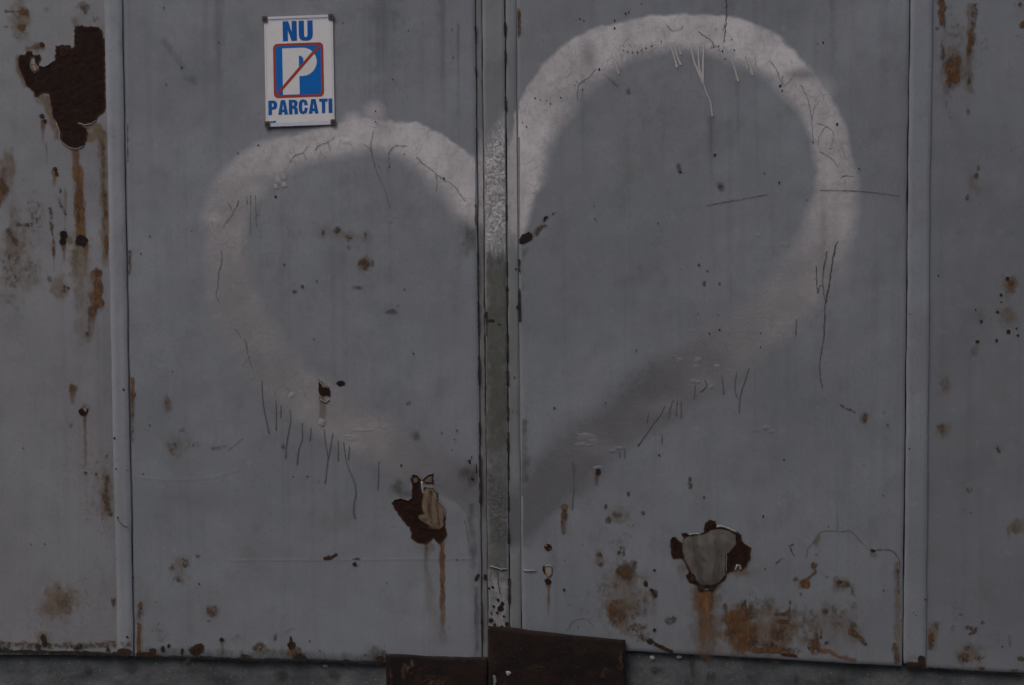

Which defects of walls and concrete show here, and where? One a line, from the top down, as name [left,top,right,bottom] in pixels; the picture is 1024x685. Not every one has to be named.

corrosion [937,0,947,29]
corrosion [941,4,977,87]
peeling [17,25,106,180]
corrosion [49,166,88,257]
corrosion [99,131,108,252]
corrosion [85,269,104,336]
peeling [413,476,444,530]
corrosion [425,540,445,622]
corrosion [616,548,657,598]
corrosion [609,600,676,653]
peeling [682,529,736,586]
corrosion [689,562,855,661]